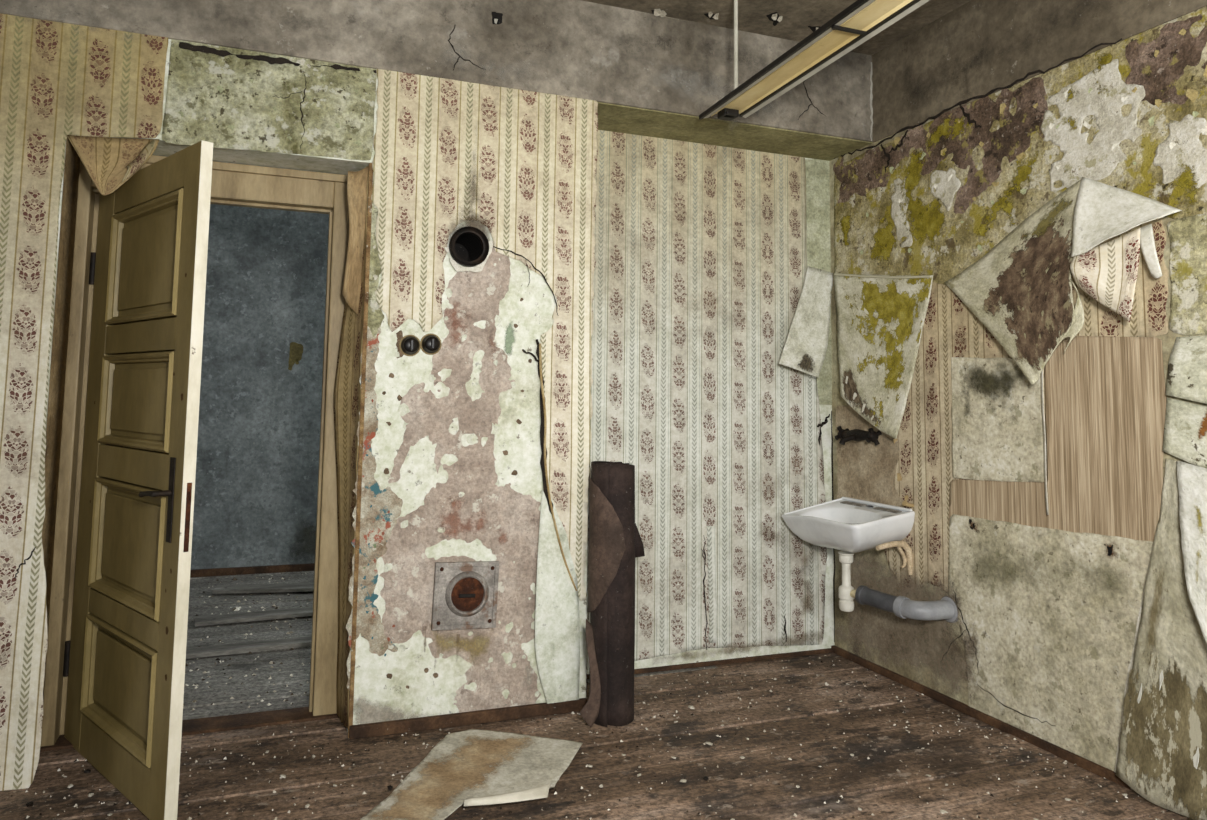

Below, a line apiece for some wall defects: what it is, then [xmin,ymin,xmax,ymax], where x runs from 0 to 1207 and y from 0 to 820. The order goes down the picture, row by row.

peeling [805,6,1207,285]
peeling [346,203,541,713]
leakage [1123,581,1207,820]